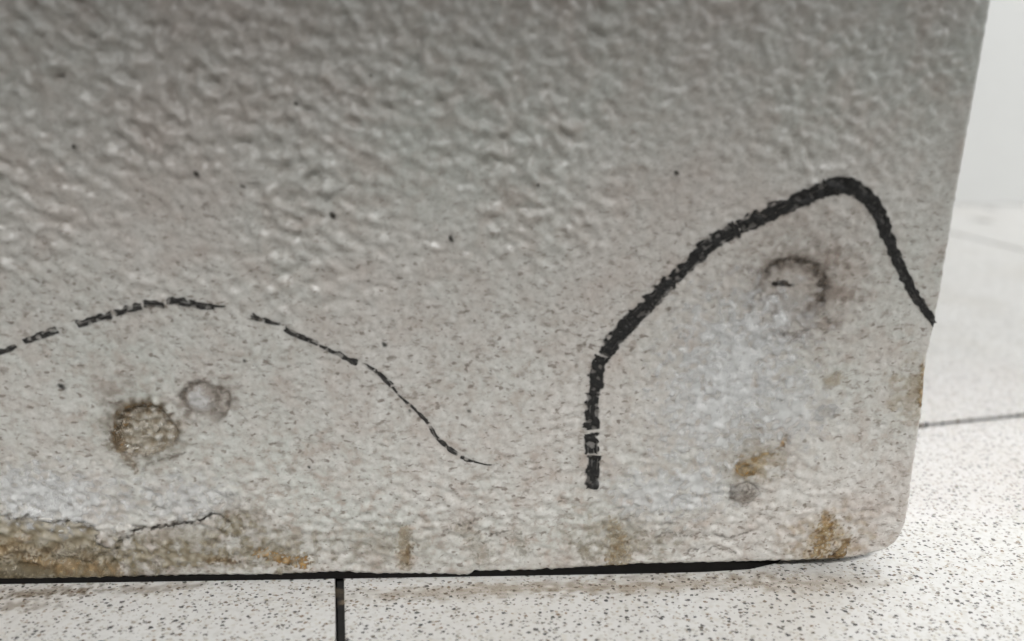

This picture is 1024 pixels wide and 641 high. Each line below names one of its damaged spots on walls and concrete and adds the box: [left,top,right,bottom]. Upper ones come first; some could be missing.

rust [804,516,854,560]
damp [0,555,123,579]